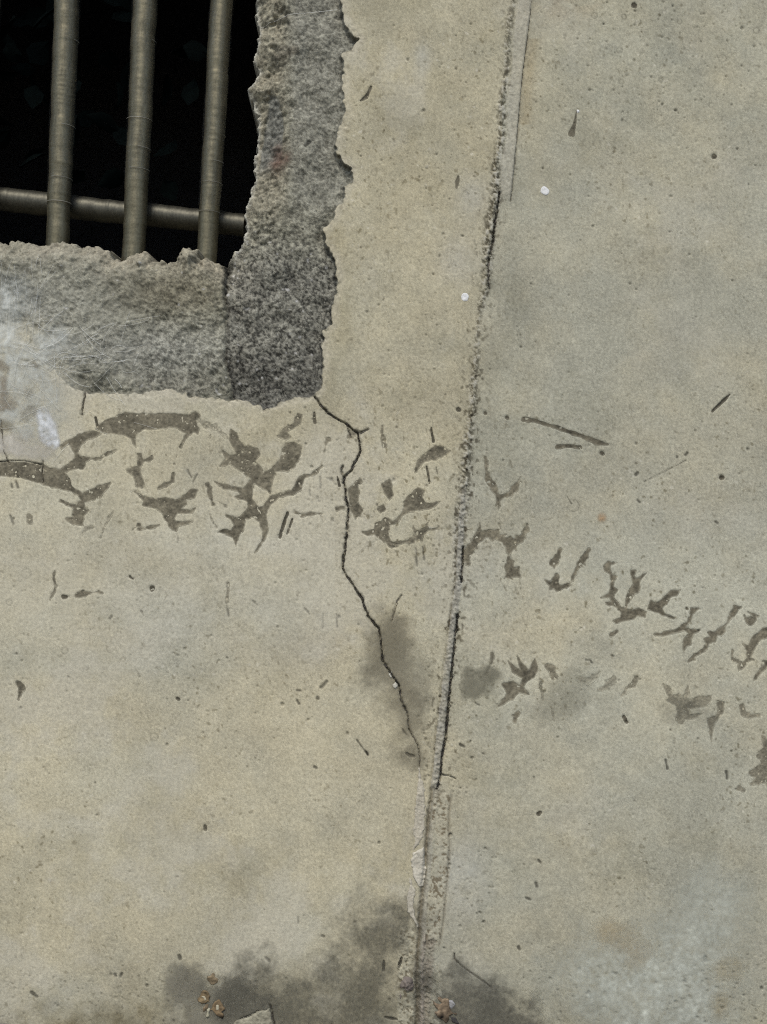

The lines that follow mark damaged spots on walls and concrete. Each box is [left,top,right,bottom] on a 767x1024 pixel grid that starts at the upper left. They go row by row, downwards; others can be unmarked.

spalling [0,0,360,411]
crack [487,186,513,287]
crack [314,397,459,789]
leakage [464,667,499,697]
leakage [167,904,408,1024]
leakage [425,960,537,1024]